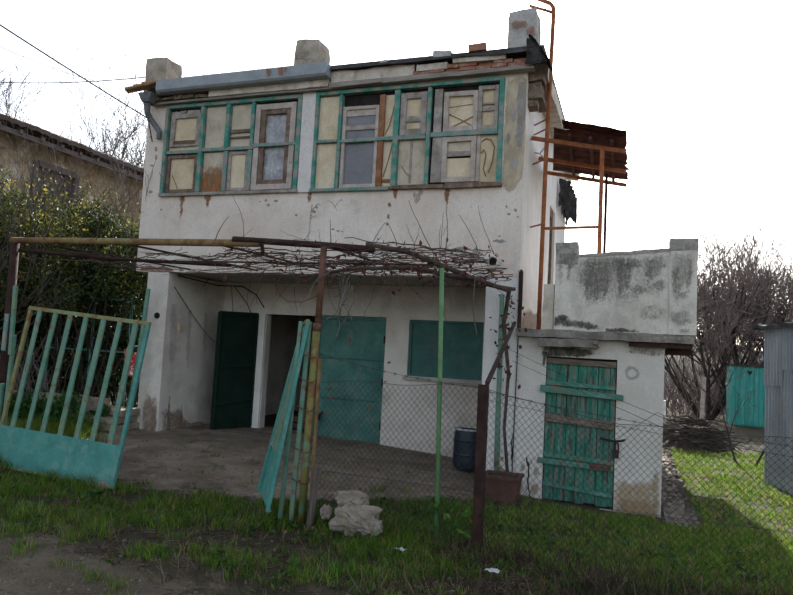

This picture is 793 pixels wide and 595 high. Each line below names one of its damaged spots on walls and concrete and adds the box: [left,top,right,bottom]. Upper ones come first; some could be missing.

flaking render [413,58,527,75]
spalling [502,77,527,190]
leakage [554,315,635,332]
leakage [143,397,203,431]